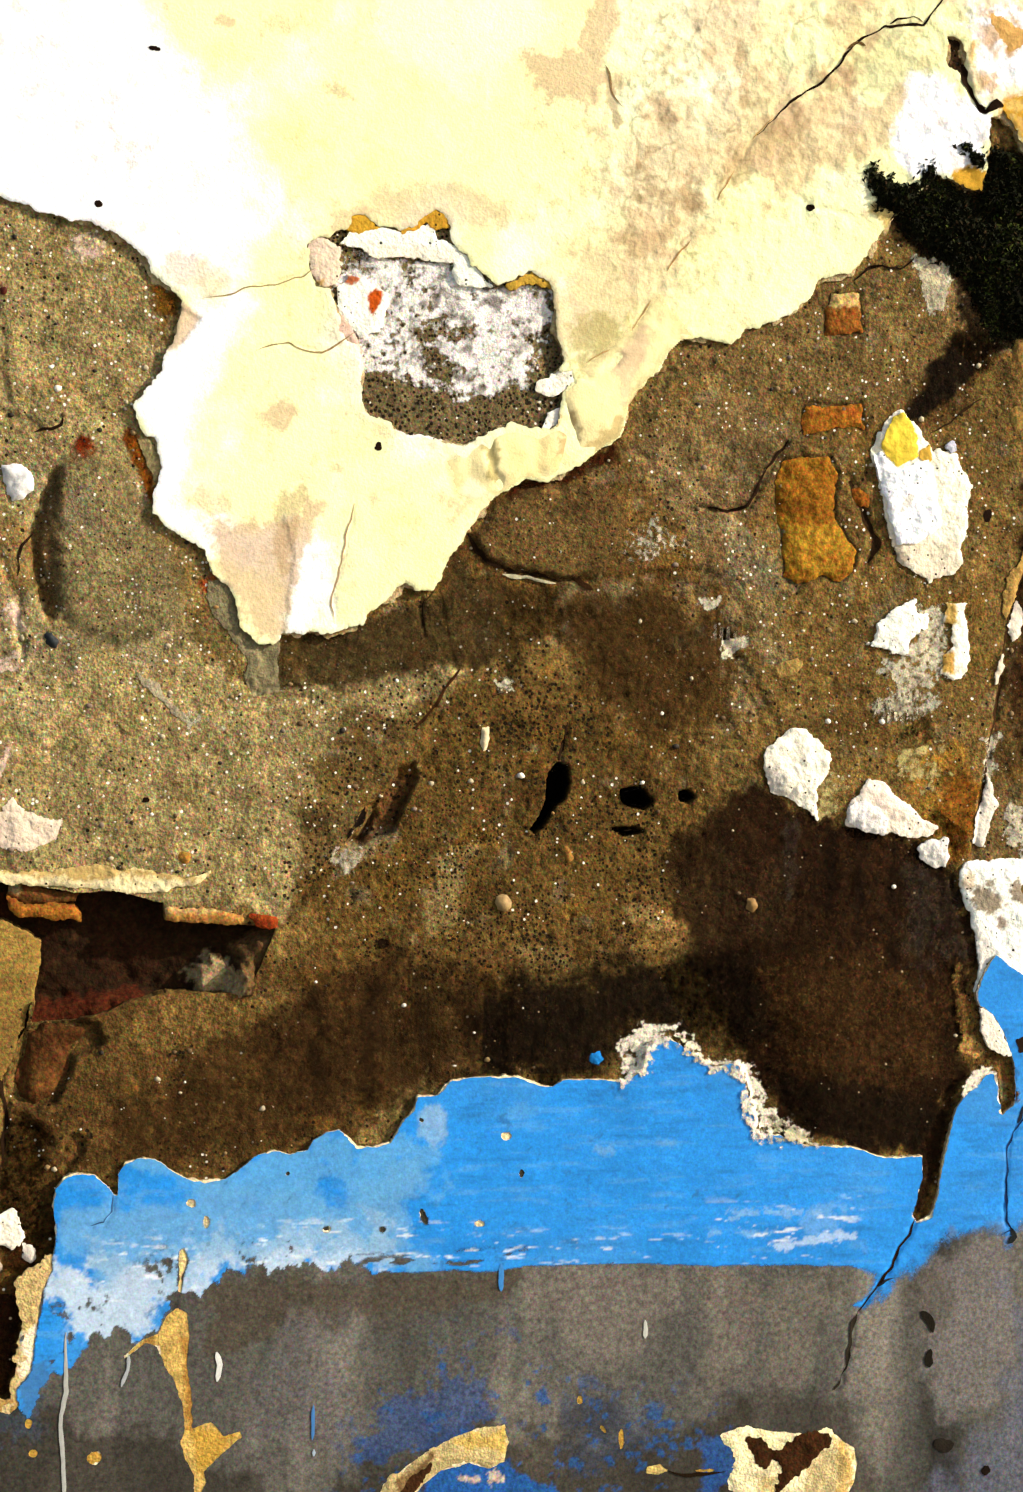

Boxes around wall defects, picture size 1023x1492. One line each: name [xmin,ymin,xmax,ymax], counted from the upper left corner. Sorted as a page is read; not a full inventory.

crack [753,0,943,138]
spalling [937,96,1023,193]
crack [960,64,1004,114]
crack [586,240,691,363]
damp [867,177,1013,425]
spalling [0,197,1023,1296]
damp [110,771,979,1220]
crack [1002,1107,1023,1244]
spalling [0,1320,22,1399]
crack [833,1217,916,1390]
crack [921,1311,935,1367]